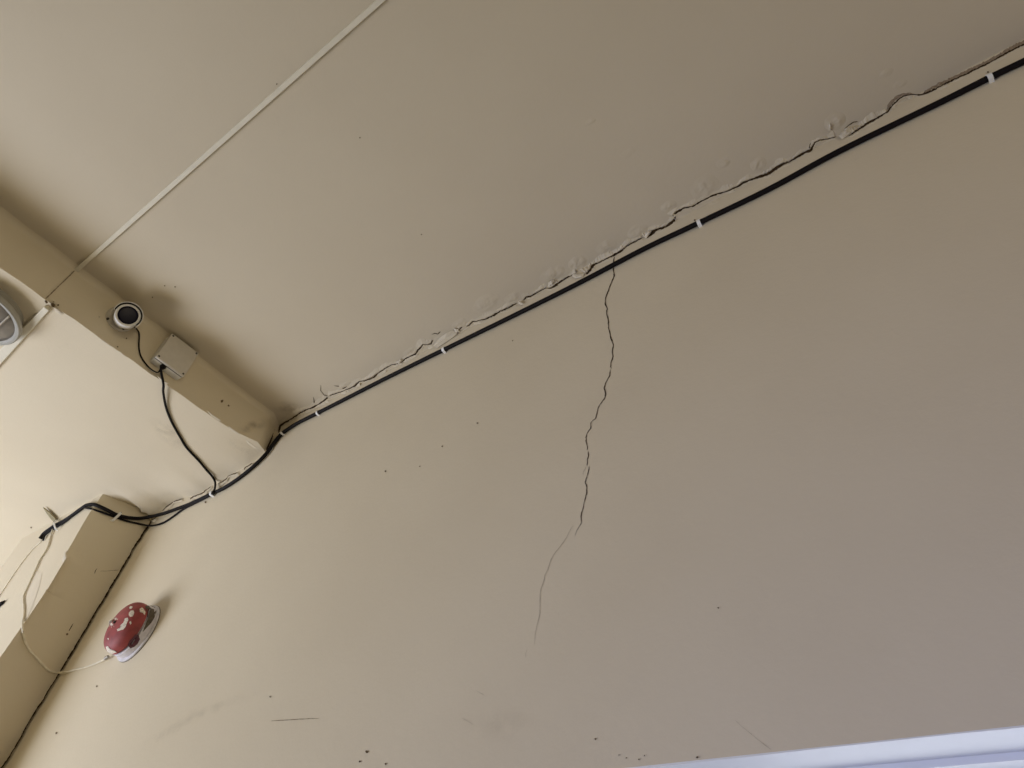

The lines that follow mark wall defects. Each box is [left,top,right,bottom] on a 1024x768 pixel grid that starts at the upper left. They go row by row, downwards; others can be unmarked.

crack [266,40,1024,592]